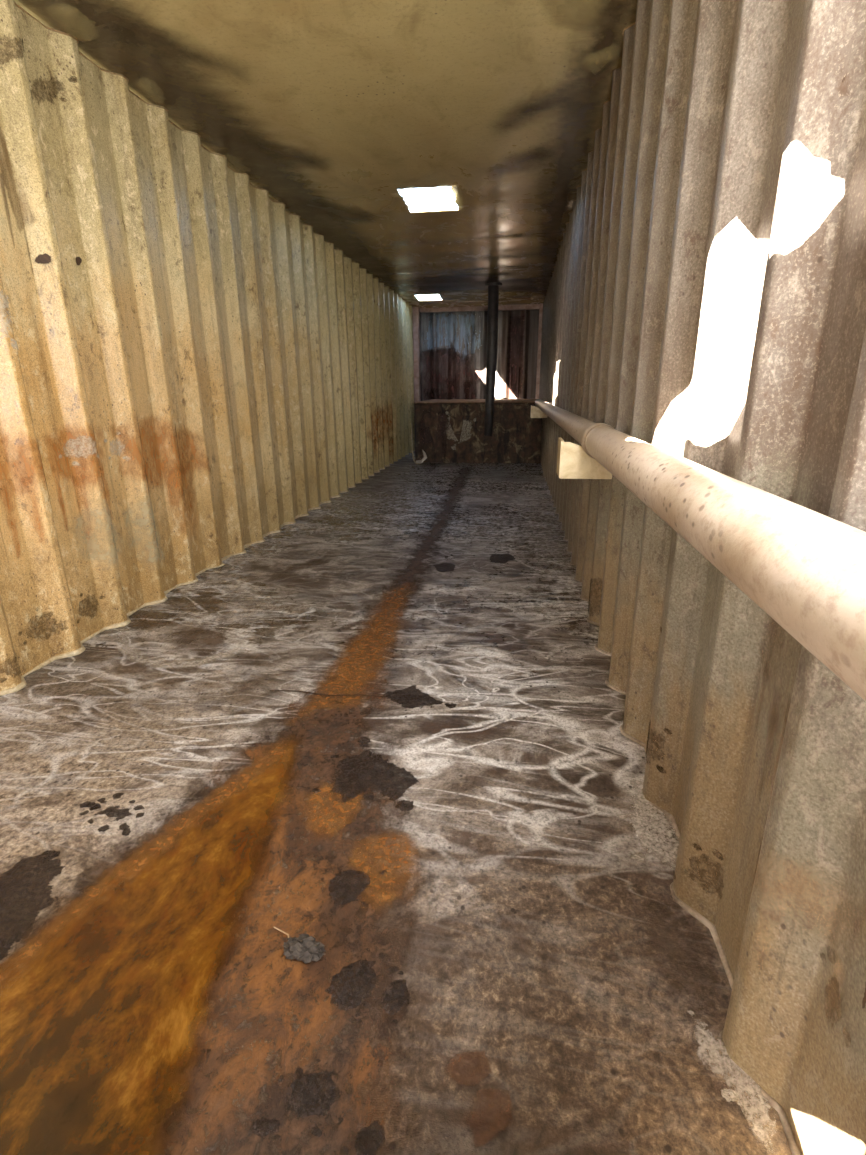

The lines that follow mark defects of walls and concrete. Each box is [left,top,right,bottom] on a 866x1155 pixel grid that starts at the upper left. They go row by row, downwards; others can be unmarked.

leakage [0,37,23,67]
leakage [28,0,636,293]
corrosion [0,430,104,528]
corrosion [119,421,203,509]
corrosion [0,468,471,1155]
leakage [618,781,724,899]